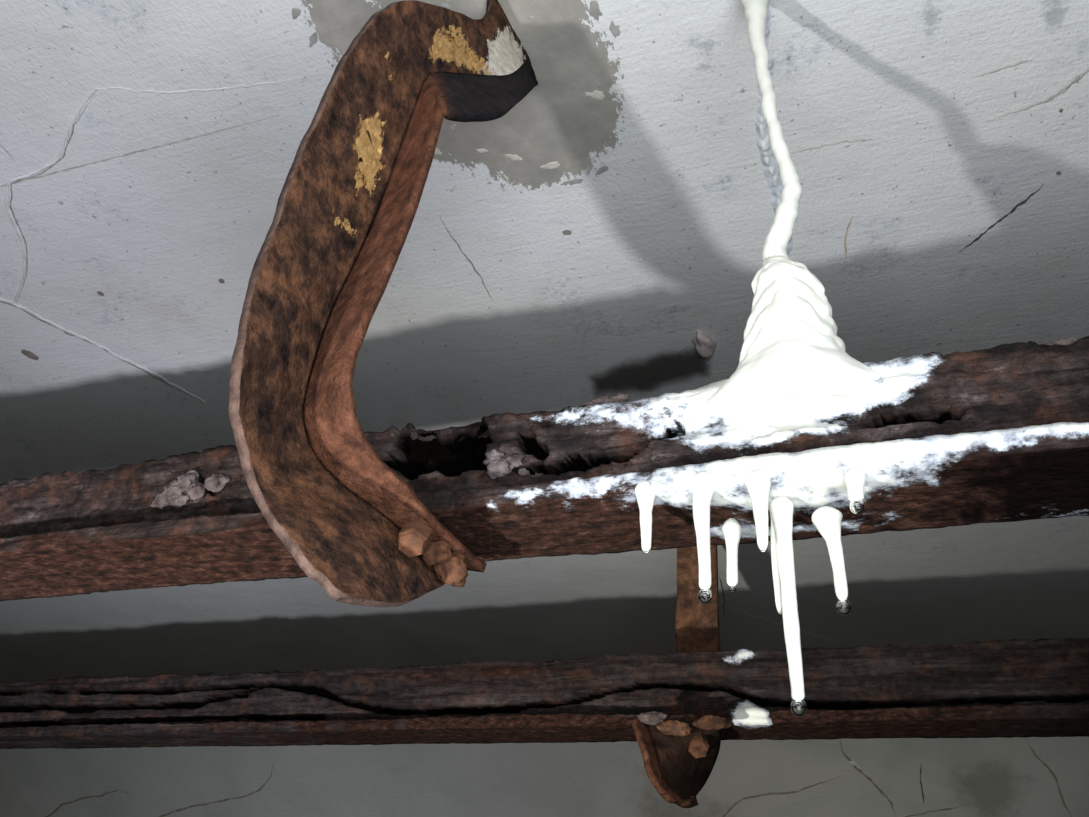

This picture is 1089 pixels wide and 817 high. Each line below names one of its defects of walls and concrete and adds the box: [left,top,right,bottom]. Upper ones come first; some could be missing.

peeling [292,0,624,194]
crack [0,80,292,403]
leakage [594,351,707,393]
crack [722,741,965,817]
crack [1026,739,1071,815]